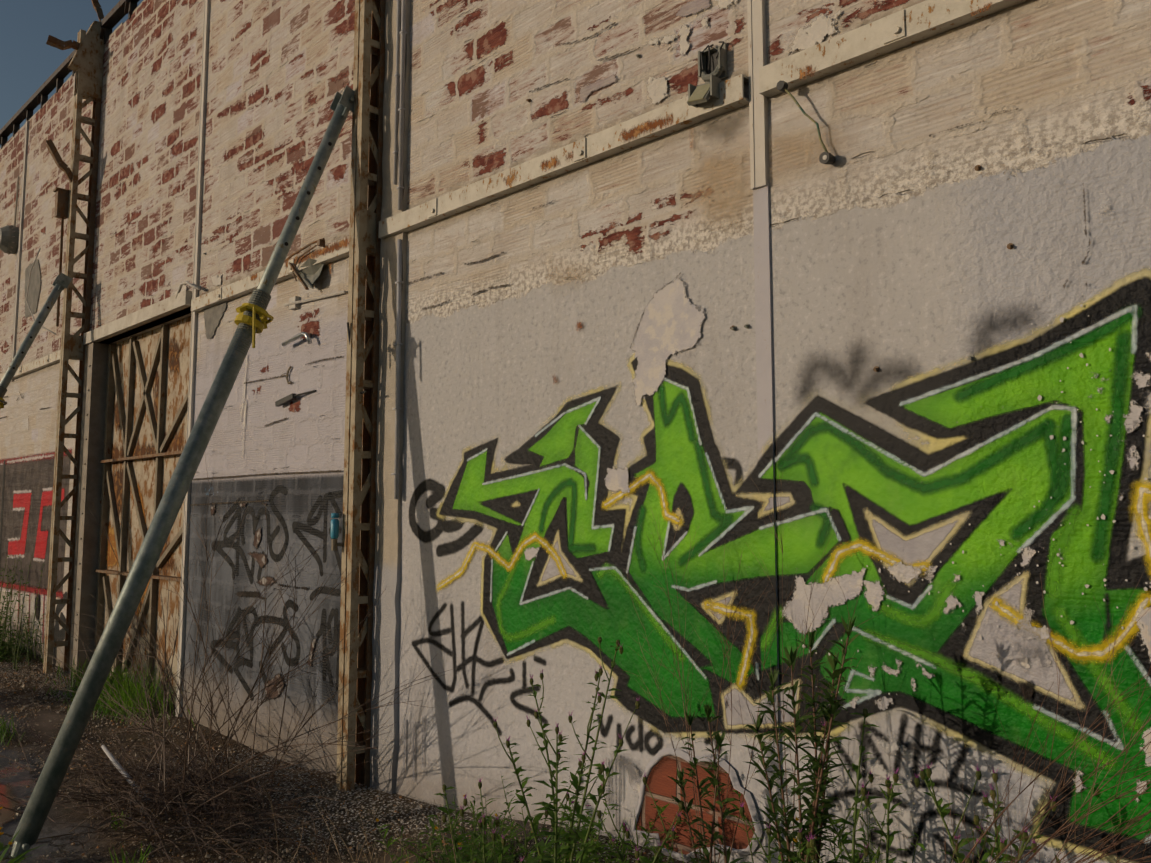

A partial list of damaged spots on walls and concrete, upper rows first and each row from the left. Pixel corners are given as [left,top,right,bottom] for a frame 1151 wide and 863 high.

peeling [430,0,514,97]
peeling [107,140,149,200]
peeling [217,85,283,118]
peeling [463,121,506,176]
peeling [109,210,187,309]
peeling [581,185,725,254]
peeling [632,277,705,406]
rust [106,338,184,568]
rust [134,540,177,617]
peeling [782,543,998,656]
peeling [1136,582,1151,661]
spalling [628,747,763,862]